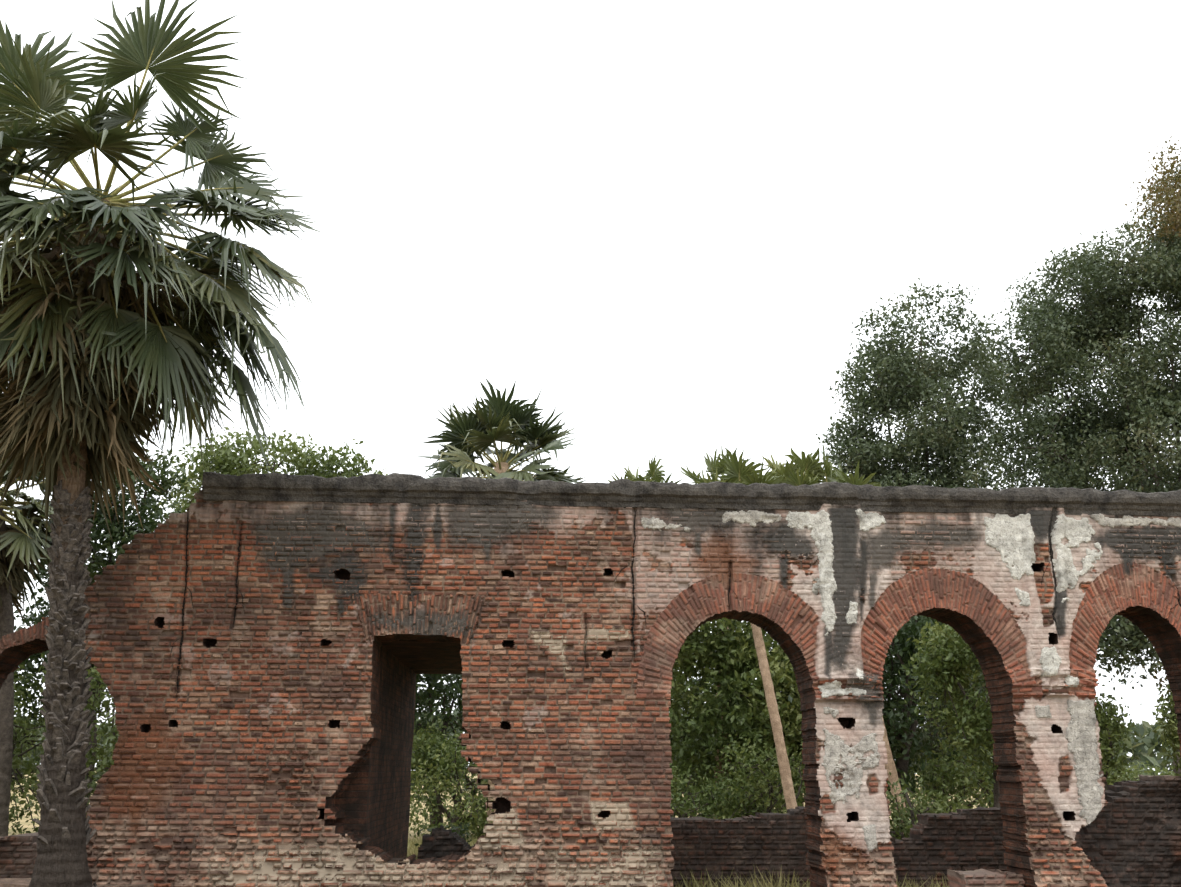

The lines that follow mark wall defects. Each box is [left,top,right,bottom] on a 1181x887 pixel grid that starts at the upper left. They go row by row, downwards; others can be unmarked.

crack [169,507,194,696]
crack [584,508,646,662]
flaking render [722,510,858,636]
flaking render [855,509,886,532]
flaking render [984,513,1181,824]
flaking render [818,669,880,852]